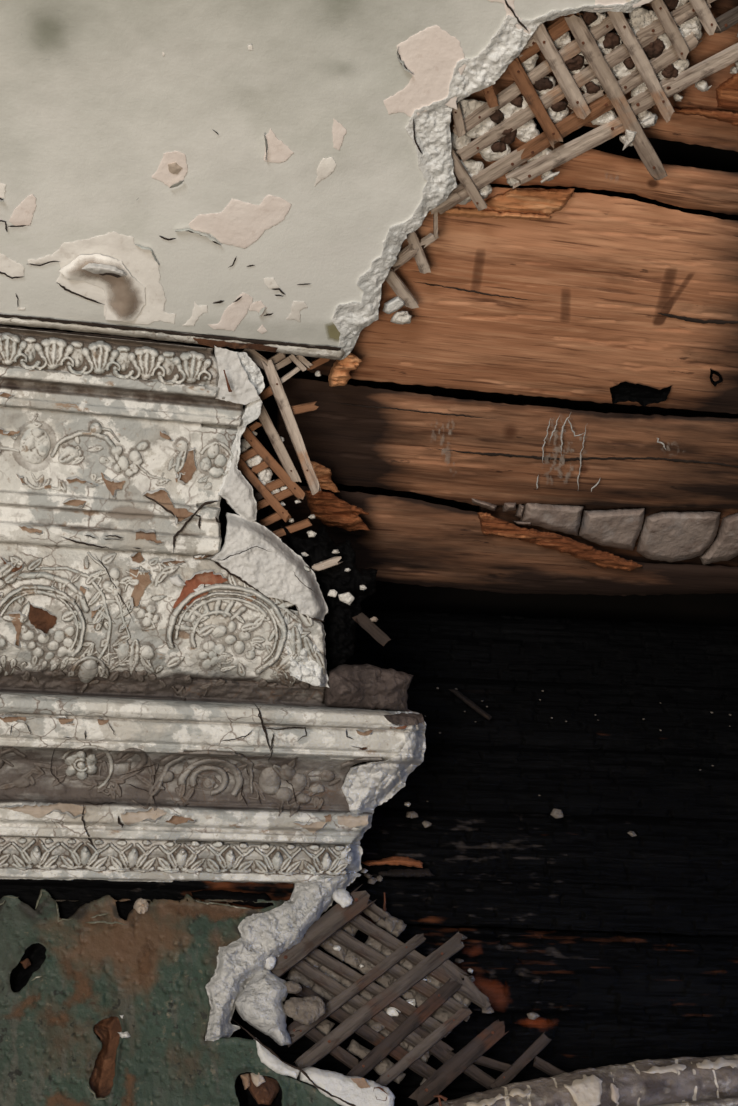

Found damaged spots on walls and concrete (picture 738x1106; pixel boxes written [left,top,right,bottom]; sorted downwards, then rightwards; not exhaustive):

spalling [332,0,656,360]
peeling [0,194,36,231]
peeling [160,195,292,249]
spalling [0,231,329,688]
crack [144,495,222,552]
crack [60,535,141,618]
crack [214,546,270,598]
crack [293,571,325,622]
spalling [205,709,426,1106]
hole [10,943,46,992]
hole [87,1015,130,1106]